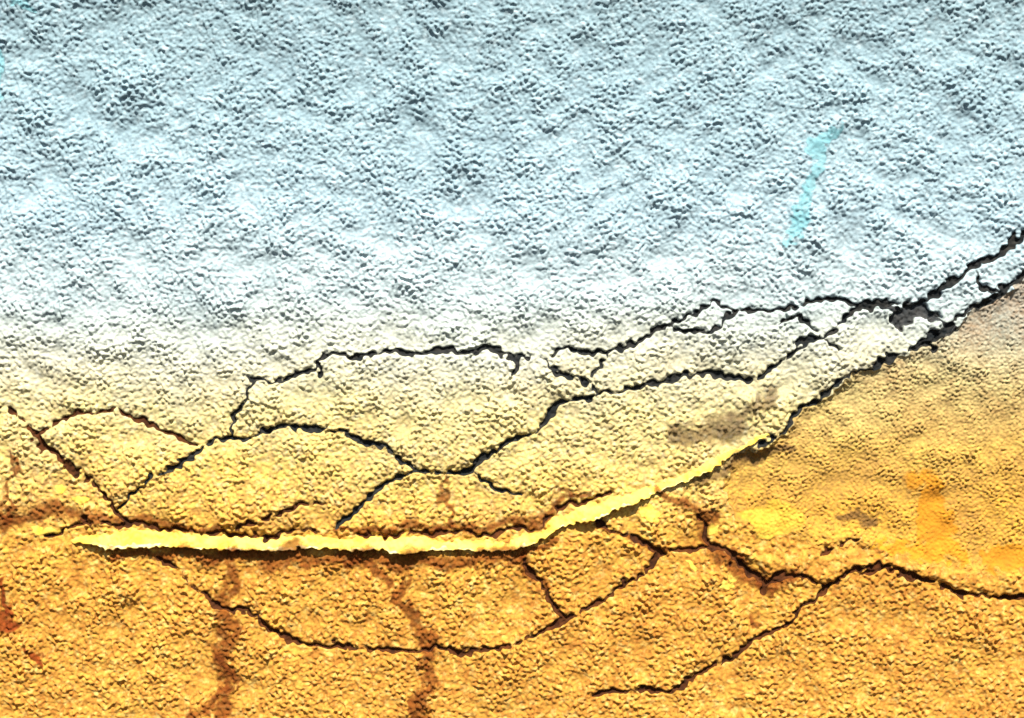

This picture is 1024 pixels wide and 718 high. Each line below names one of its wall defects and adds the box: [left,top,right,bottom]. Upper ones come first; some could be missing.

rust [110,476,591,718]
crack [0,230,1024,697]